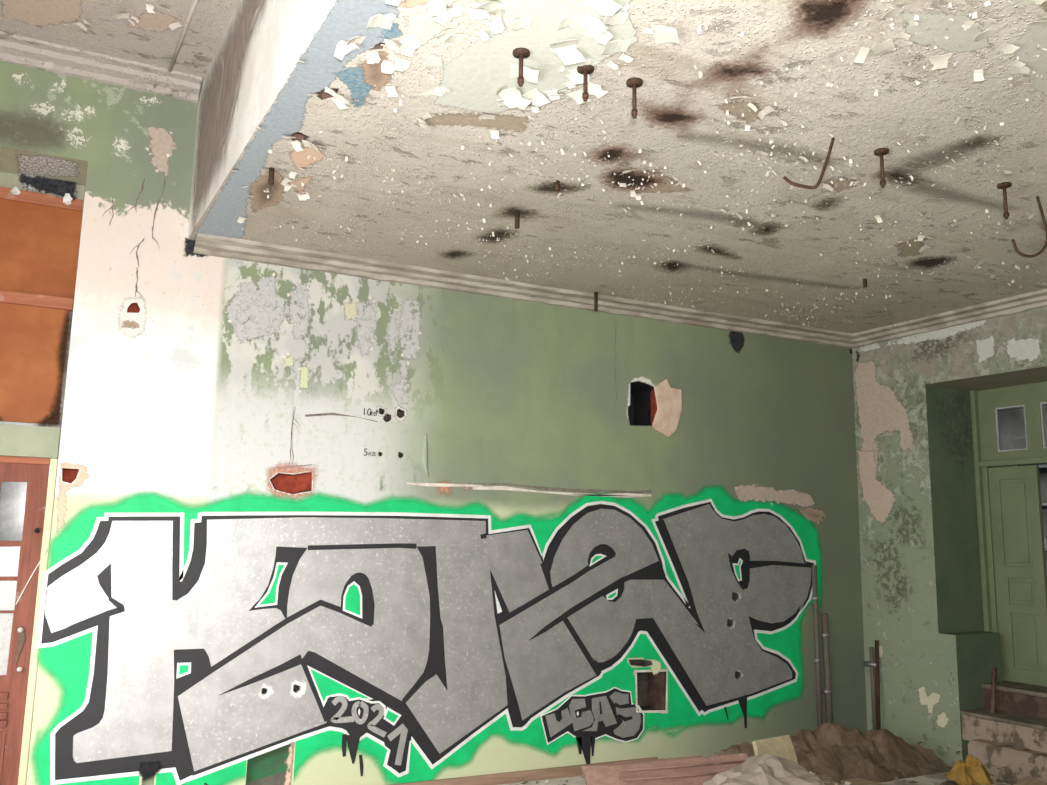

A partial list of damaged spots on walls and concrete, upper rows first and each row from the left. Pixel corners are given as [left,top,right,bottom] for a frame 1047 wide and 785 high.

peeling [116,4,182,32]
peeling [111,136,133,158]
peeling [145,127,177,176]
peeling [194,0,1047,328]
crack [102,179,165,301]
flaking render [118,297,147,338]
peeling [225,273,312,344]
peeling [343,297,422,421]
spalling [626,376,682,437]
peeling [853,315,1042,524]
flaking render [268,464,315,499]
spalling [734,484,825,524]